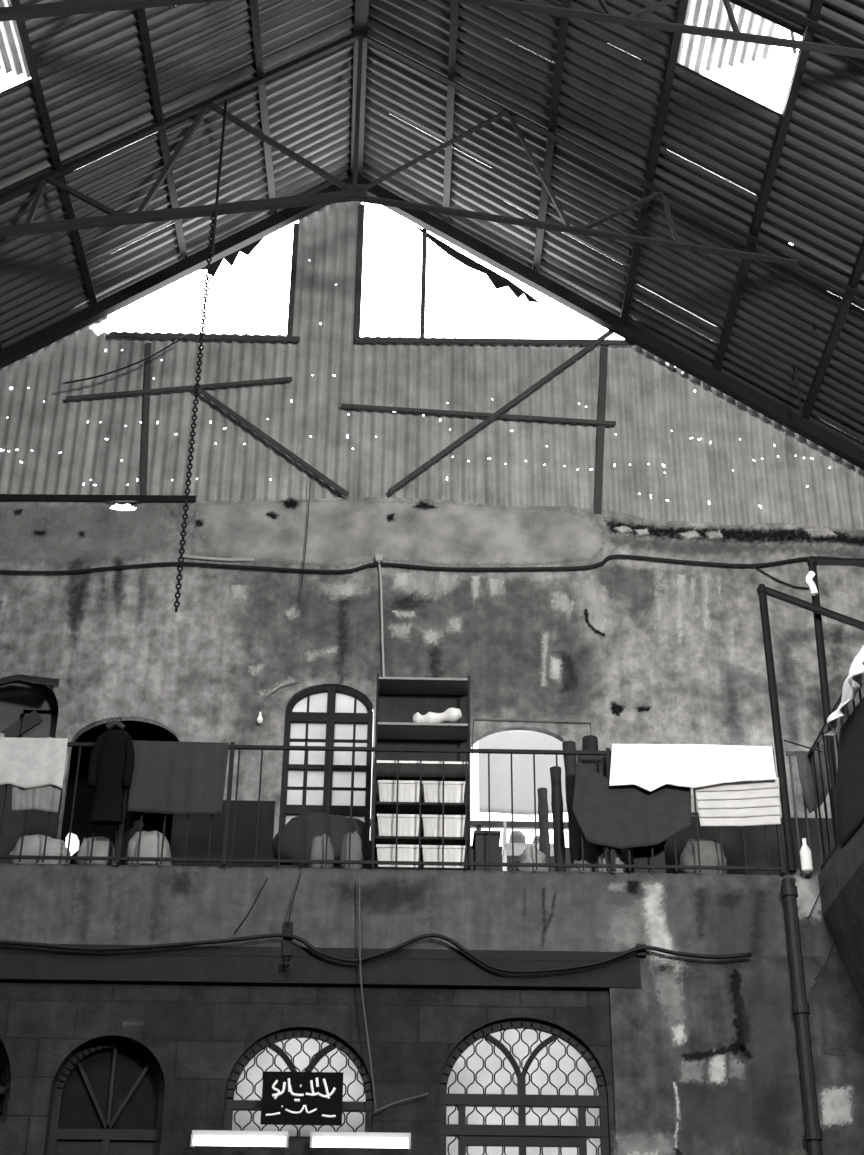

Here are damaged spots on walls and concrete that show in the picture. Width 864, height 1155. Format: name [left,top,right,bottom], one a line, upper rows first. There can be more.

flaking render [597,881,705,1046]
spalling [680,1051,745,1084]
flaking render [614,1132,674,1155]